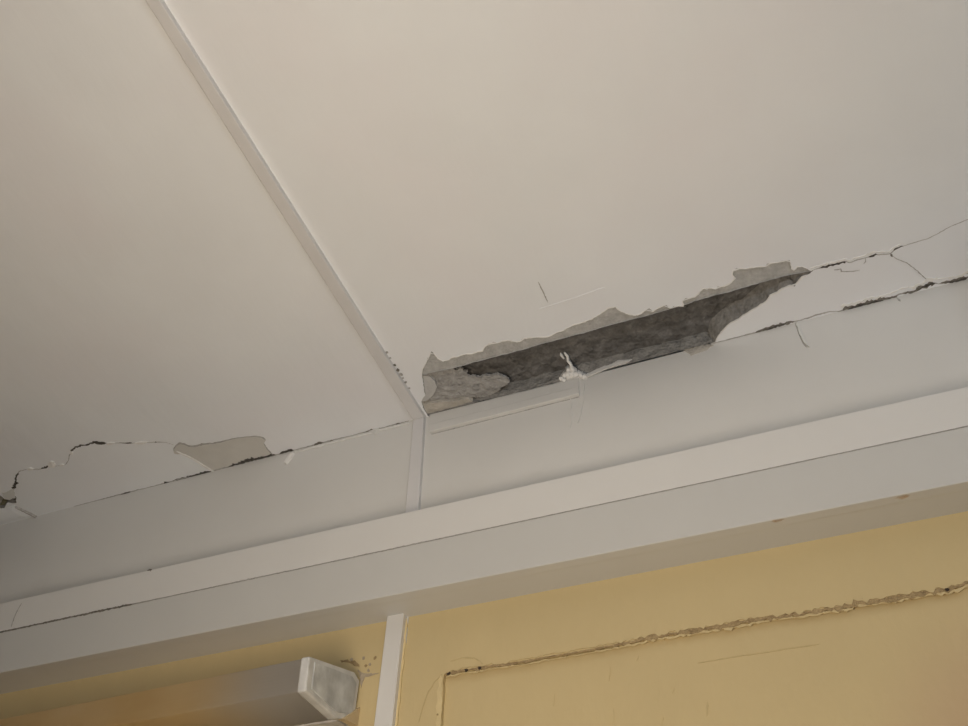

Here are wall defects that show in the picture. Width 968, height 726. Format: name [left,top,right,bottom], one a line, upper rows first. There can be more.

flaking render [421,260,811,415]
crack [710,219,968,344]
flaking render [0,489,16,508]
peeling [173,436,273,472]
crack [419,578,968,720]